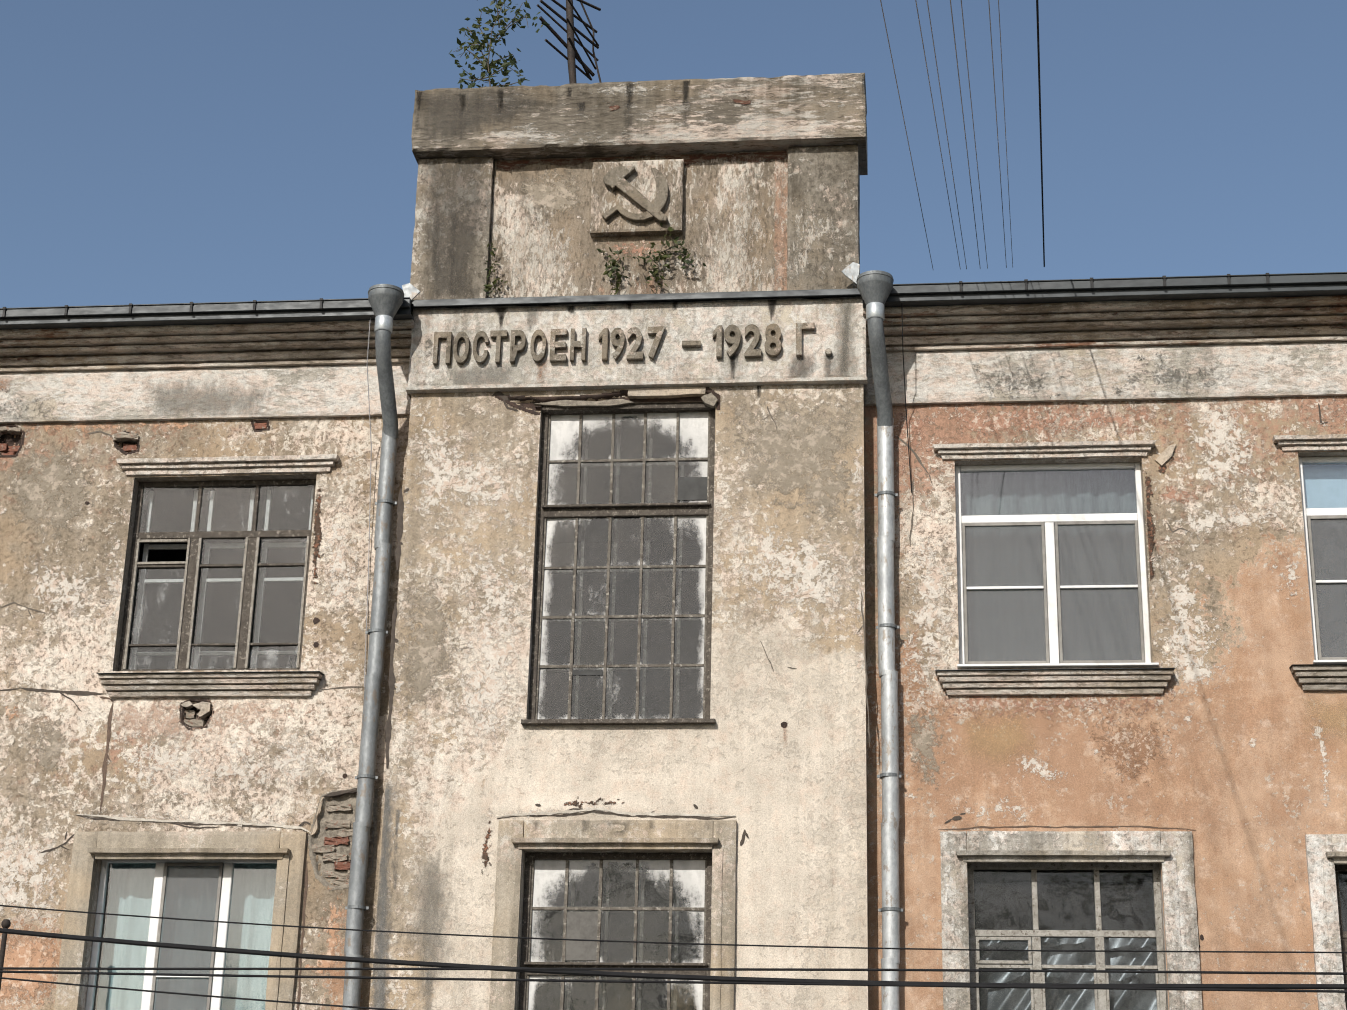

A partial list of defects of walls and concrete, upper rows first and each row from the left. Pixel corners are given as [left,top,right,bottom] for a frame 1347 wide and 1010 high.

peeling [0,421,198,628]
crack [0,687,312,1010]
peeling [76,697,357,988]
crack [322,684,363,692]
flaking render [366,789,378,881]
flaking render [481,796,623,875]
peeling [495,386,864,678]
peeling [944,750,1068,824]
peeling [893,400,1285,799]
peeling [1272,562,1301,599]